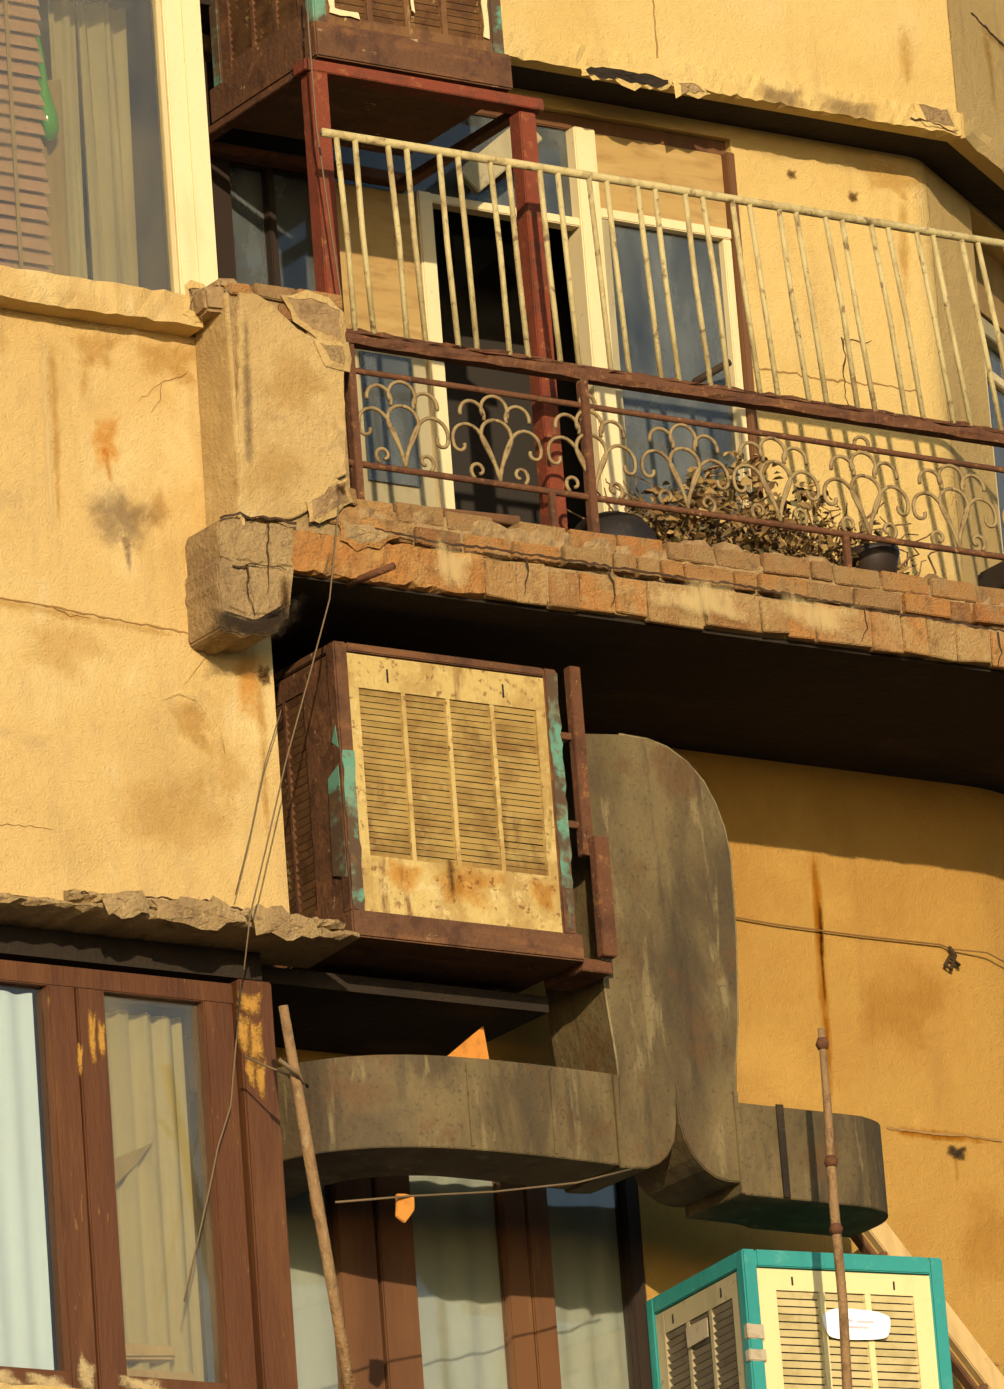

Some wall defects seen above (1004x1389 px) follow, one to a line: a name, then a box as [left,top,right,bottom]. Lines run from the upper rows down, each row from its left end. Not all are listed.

spalling [581,65,711,99]
spalling [911,101,959,134]
spalling [183,278,352,372]
crack [759,337,916,405]
crack [0,597,208,682]
spalling [69,890,324,941]